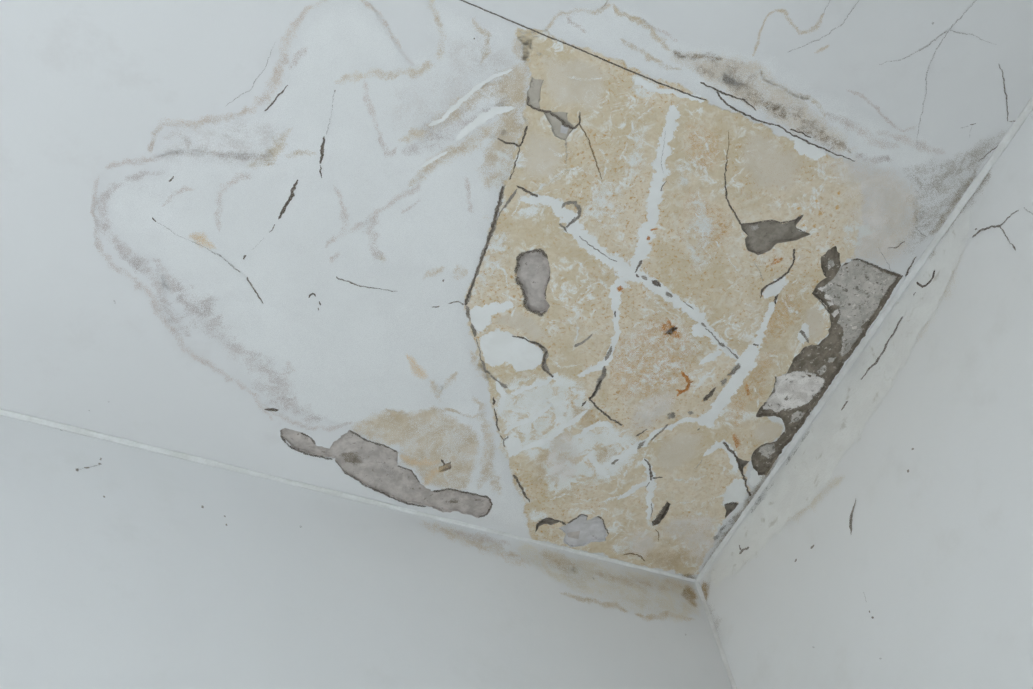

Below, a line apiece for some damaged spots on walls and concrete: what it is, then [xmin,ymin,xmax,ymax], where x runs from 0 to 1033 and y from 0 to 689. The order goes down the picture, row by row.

crack [152,95,334,303]
crack [229,53,288,111]
spalling [280,428,493,518]
water stain [90,0,809,634]
crack [433,96,602,447]
crack [513,475,530,502]
crack [461,0,854,224]
crack [559,201,759,561]
peeling [464,28,923,577]
water stain [536,0,1007,259]
crack [756,249,796,304]
crack [879,3,1013,149]